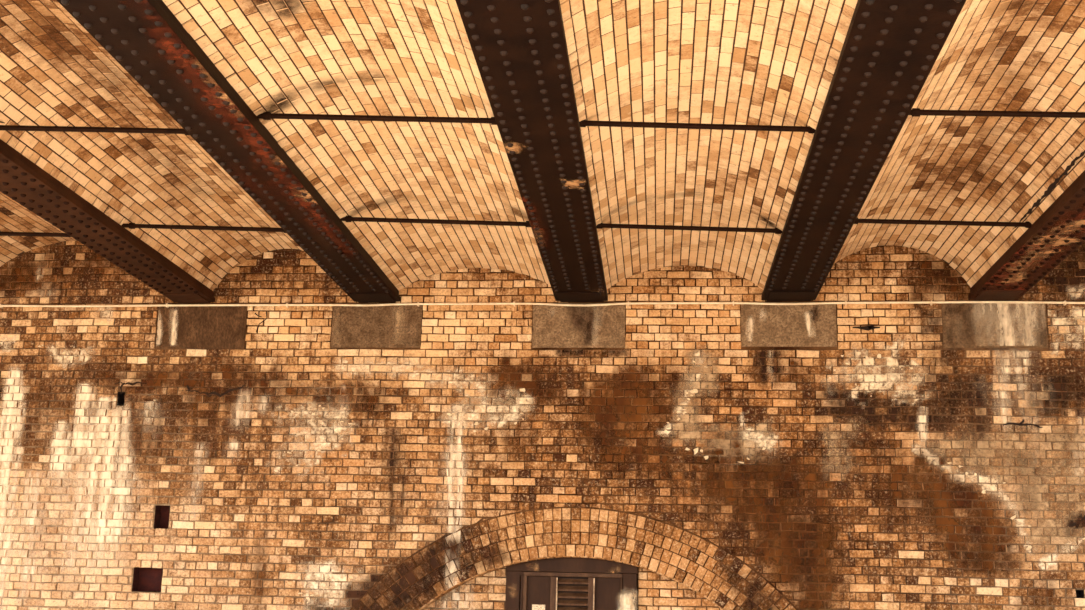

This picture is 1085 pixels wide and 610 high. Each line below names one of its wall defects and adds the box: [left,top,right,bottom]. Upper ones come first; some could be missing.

damp [911,257,968,300]
damp [488,358,563,445]
damp [579,366,697,479]
damp [755,350,797,384]
damp [927,346,986,439]
damp [960,303,1034,390]
damp [1044,376,1085,416]
damp [684,435,840,610]
damp [853,406,1012,574]
damp [1067,514,1085,535]